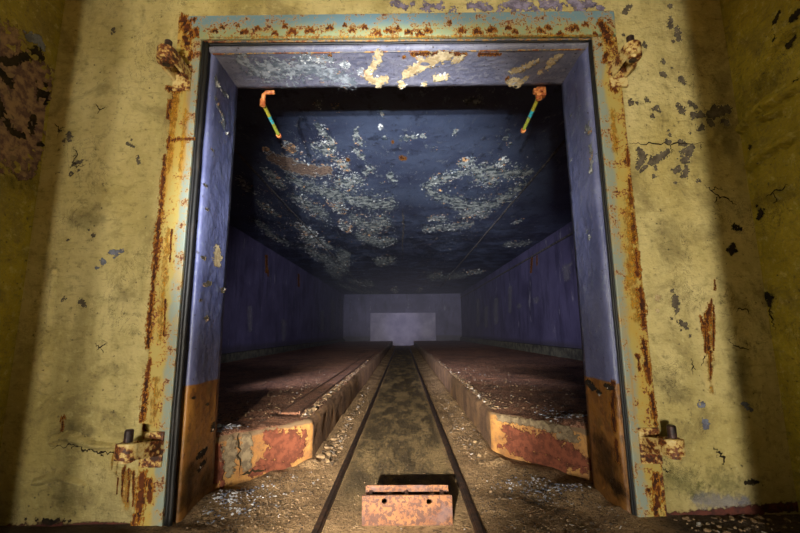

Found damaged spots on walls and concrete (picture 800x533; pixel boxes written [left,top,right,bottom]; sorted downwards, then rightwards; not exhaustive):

spalling [0,20,55,181]
rust [139,85,195,432]
peeling [233,48,466,90]
peeling [234,120,486,286]
rust [178,12,615,64]
peeling [417,134,535,254]
rust [624,178,659,428]
crack [630,142,704,153]
peeling [634,100,734,185]
rust [699,279,717,394]
crack [53,443,114,456]
rust [646,471,666,517]